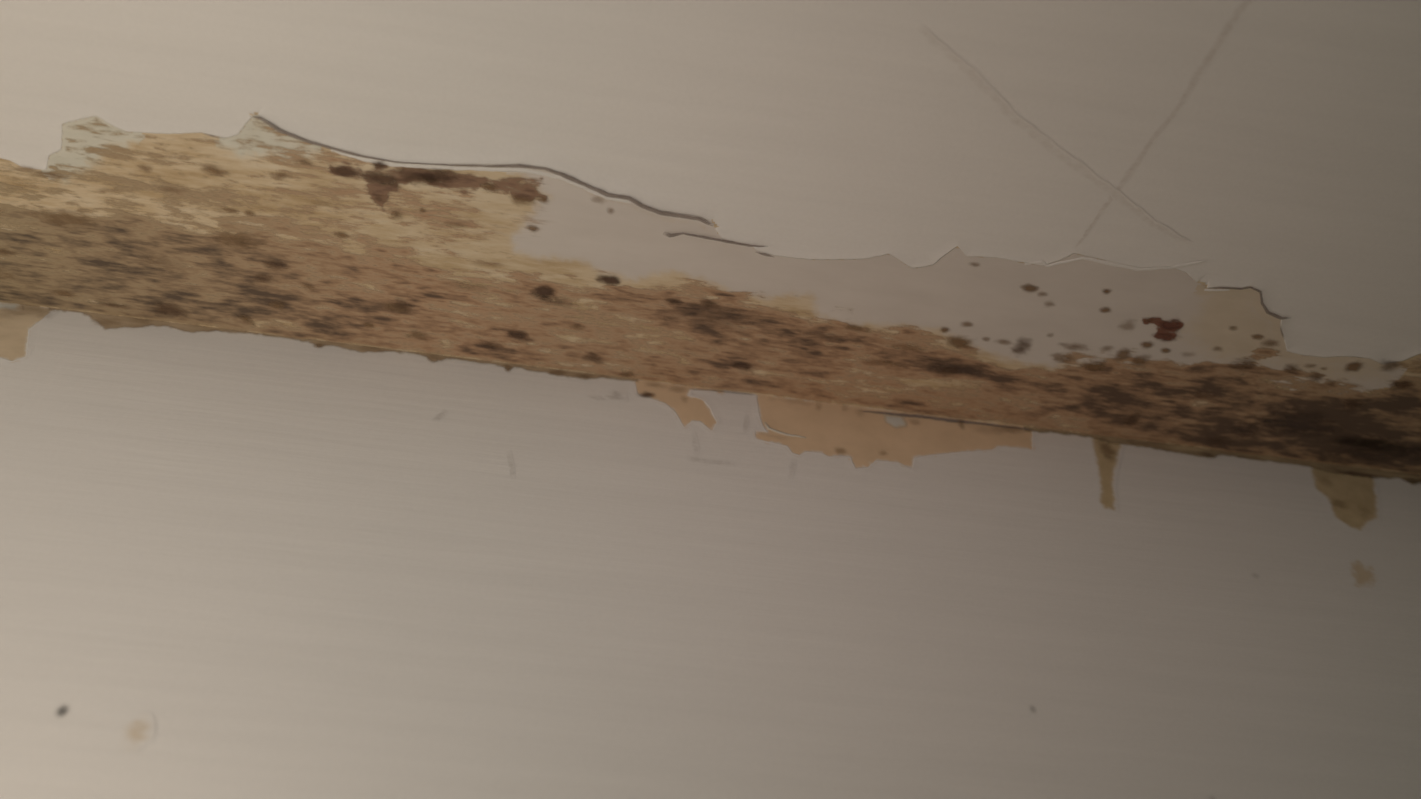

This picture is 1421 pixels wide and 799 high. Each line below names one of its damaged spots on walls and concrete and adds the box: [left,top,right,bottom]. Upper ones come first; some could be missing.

damp [0,120,1421,475]
peeling [0,102,1421,536]